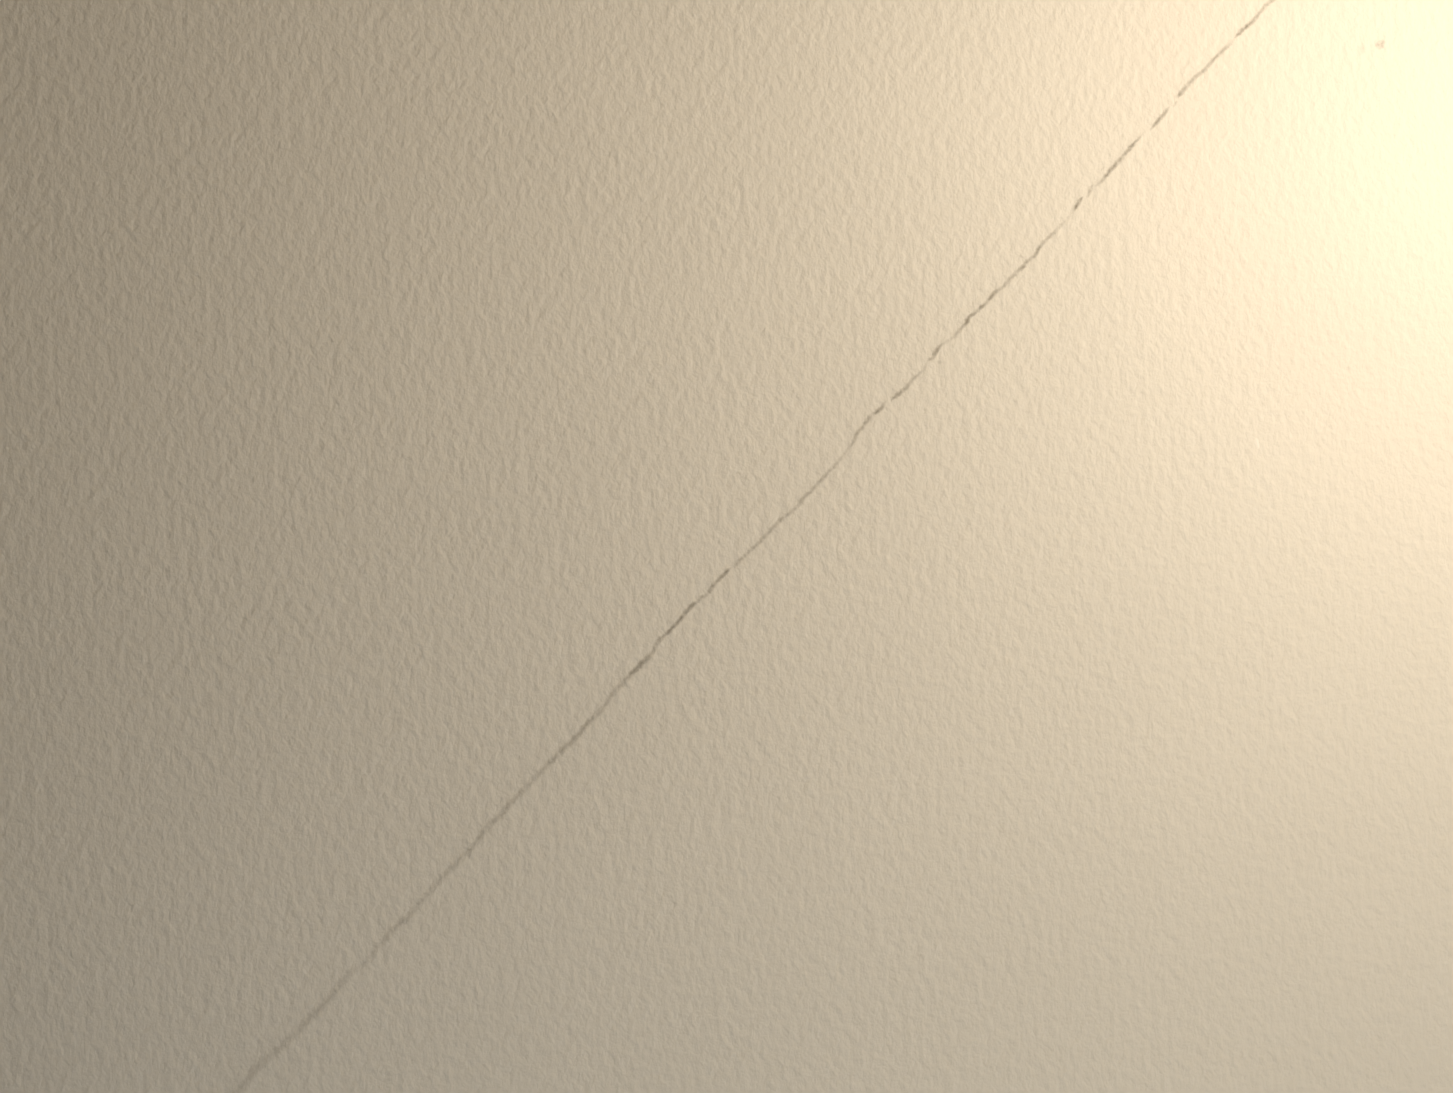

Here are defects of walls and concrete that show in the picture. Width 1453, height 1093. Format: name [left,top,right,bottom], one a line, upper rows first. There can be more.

crack [219,0,1280,1093]